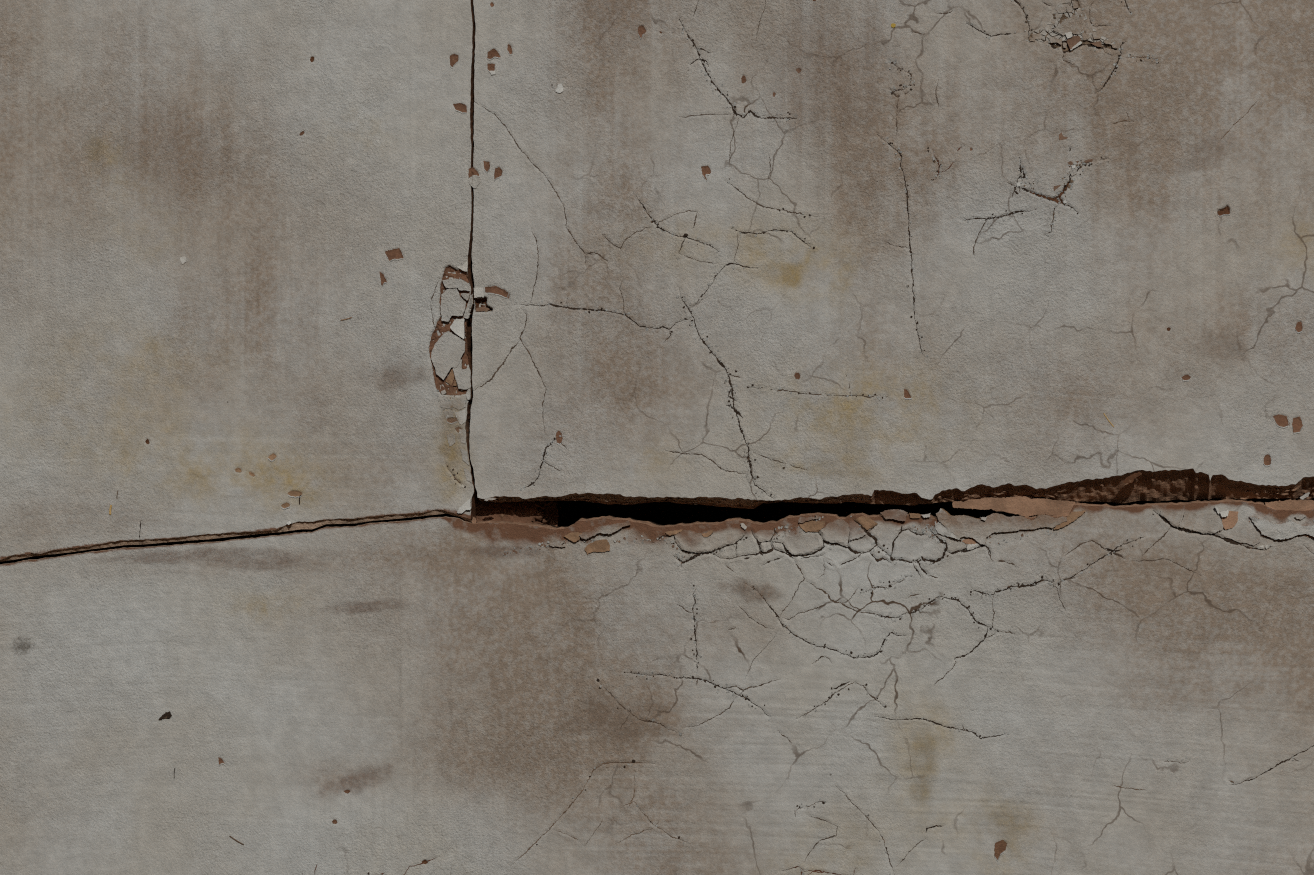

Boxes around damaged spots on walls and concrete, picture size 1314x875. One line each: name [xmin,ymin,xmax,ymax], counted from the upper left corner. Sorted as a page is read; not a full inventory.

crack [470,0,607,263]
crack [679,0,811,218]
crack [881,11,1016,357]
peeling [429,260,510,483]
crack [0,186,1314,743]
crack [513,760,686,864]
crack [783,789,941,875]
crack [1229,745,1314,785]